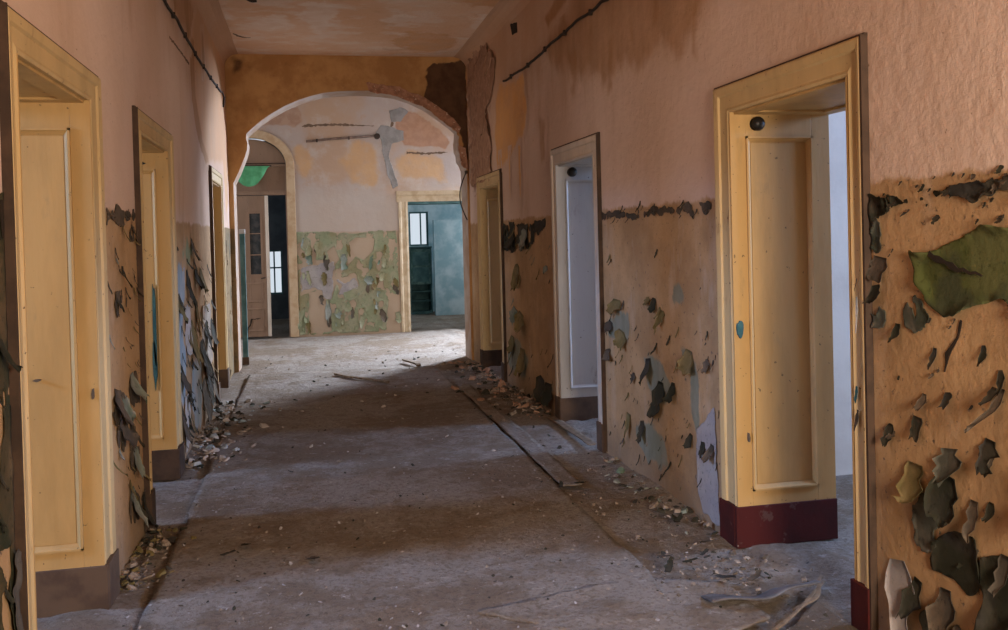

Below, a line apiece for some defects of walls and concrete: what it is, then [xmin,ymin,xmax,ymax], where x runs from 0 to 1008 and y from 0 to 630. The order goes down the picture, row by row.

peeling [0,192,24,630]
peeling [108,248,159,533]
peeling [177,227,239,453]
peeling [296,230,402,335]
damp [221,0,499,196]
spalling [366,44,528,203]
damp [534,0,737,123]
peeling [602,200,711,224]
peeling [609,275,720,526]
peeling [854,165,1008,343]
peeling [884,448,1008,630]
peeling [975,438,1000,478]